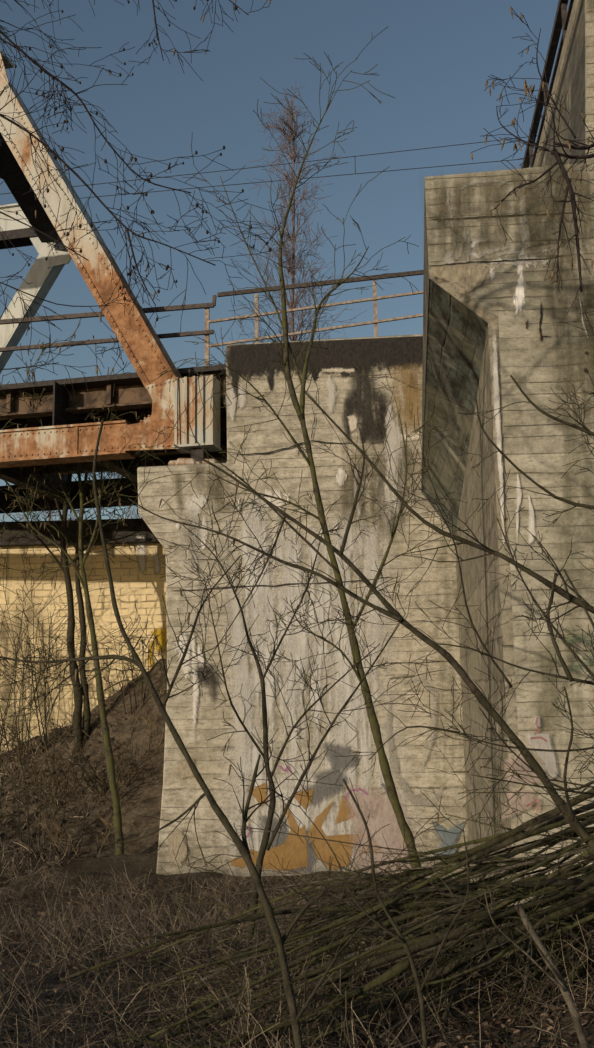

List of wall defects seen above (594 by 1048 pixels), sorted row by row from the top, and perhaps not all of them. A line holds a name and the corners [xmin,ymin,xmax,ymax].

leakage [437,168,594,418]
leakage [174,633,217,725]
leakage [175,468,223,550]
efflorescence [227,384,245,420]
leakage [232,489,290,808]
leakage [281,535,306,715]
leakage [331,531,353,739]
leakage [327,370,413,678]
efflorescence [492,337,537,547]